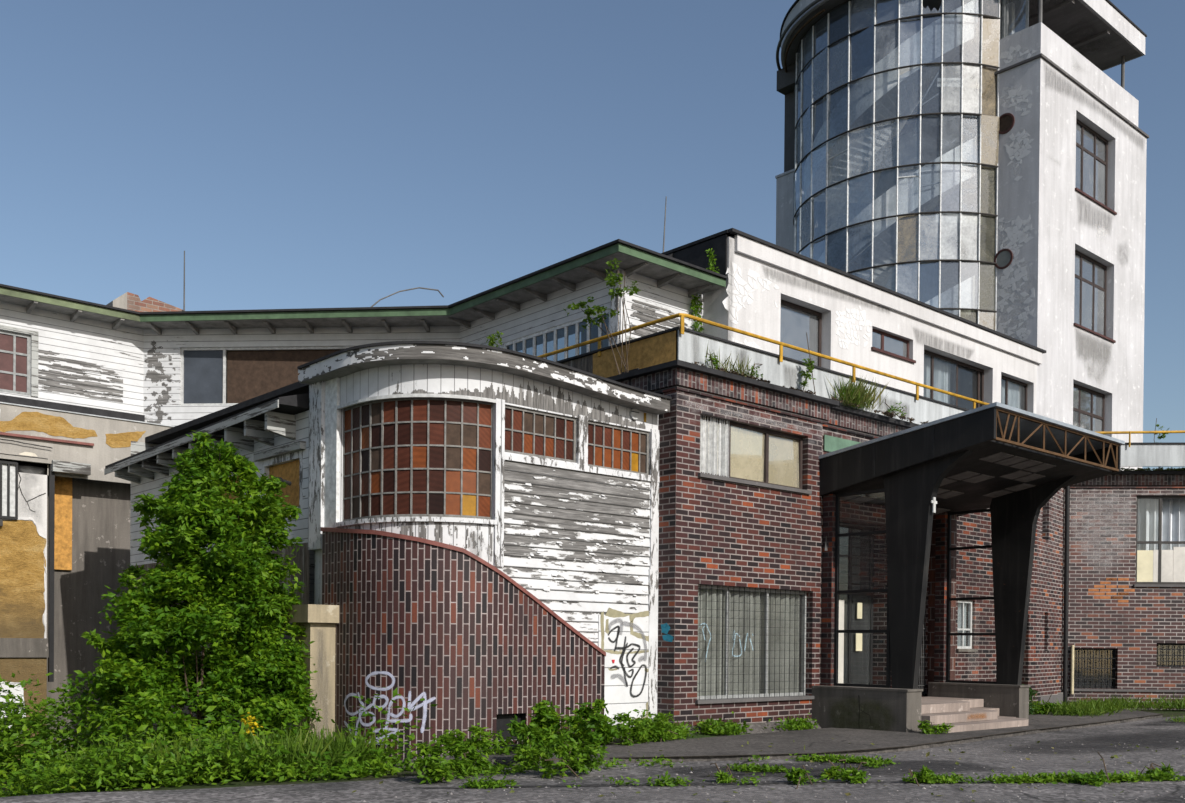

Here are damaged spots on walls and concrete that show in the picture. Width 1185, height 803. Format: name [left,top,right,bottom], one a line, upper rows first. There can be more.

peeling [722,261,779,351]
peeling [996,215,1035,341]
spalling [0,340,176,448]
peeling [298,344,468,382]
peeling [392,348,667,429]
spalling [0,517,47,638]
peeling [346,460,650,654]